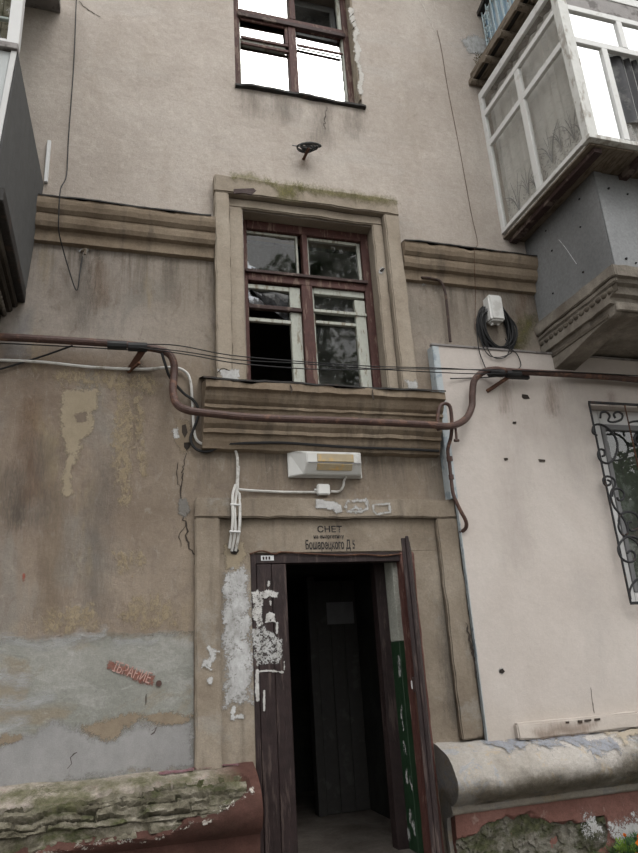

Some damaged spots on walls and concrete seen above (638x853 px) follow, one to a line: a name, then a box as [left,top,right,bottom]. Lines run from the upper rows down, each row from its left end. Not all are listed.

spalling [348,7,364,95]
damp [231,172,397,202]
peeling [60,386,101,497]
crack [176,453,195,564]
peeling [201,541,255,721]
spalling [82,711,194,742]
peeling [483,728,638,763]
spalling [0,763,254,853]
spalling [456,808,638,853]